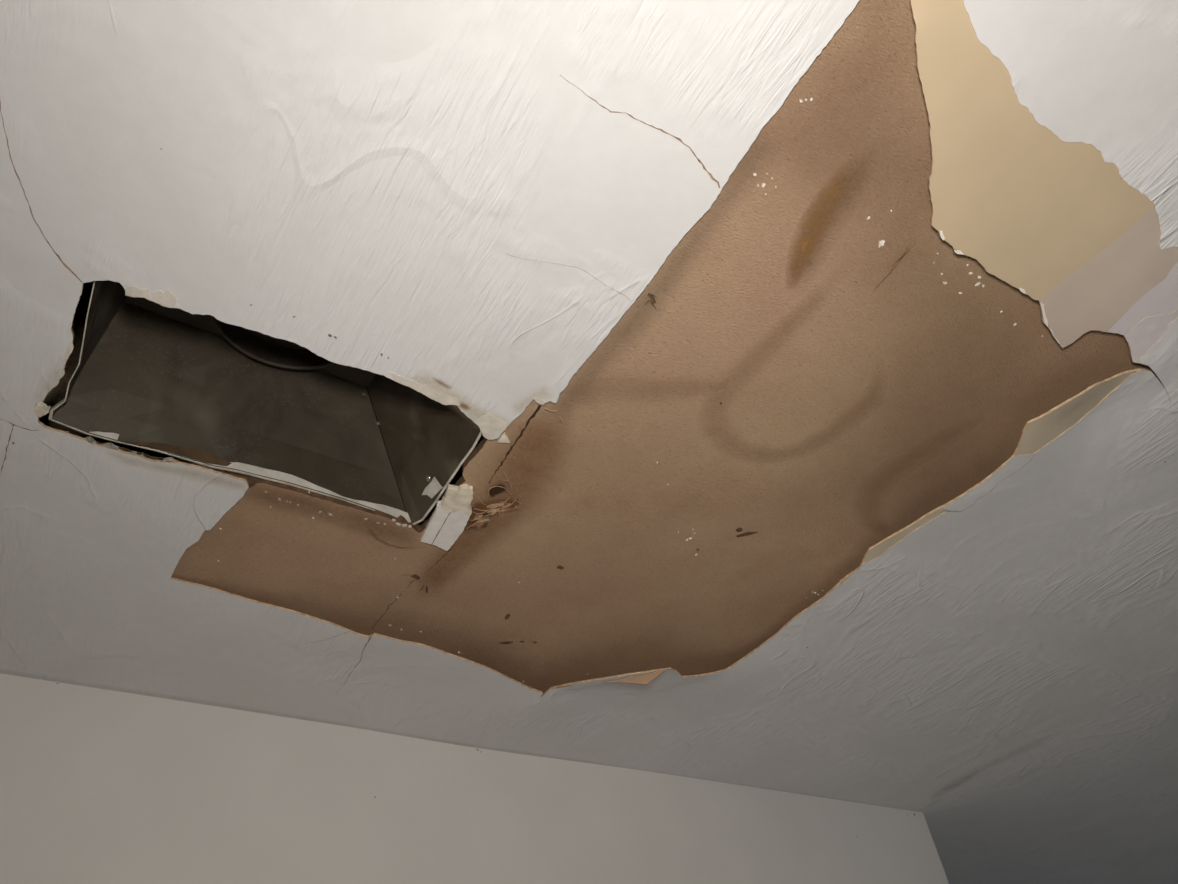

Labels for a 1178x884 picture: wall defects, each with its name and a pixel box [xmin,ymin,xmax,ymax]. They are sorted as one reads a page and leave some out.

crack [0,101,83,283]
crack [560,75,720,188]
flaking render [85,0,1178,694]